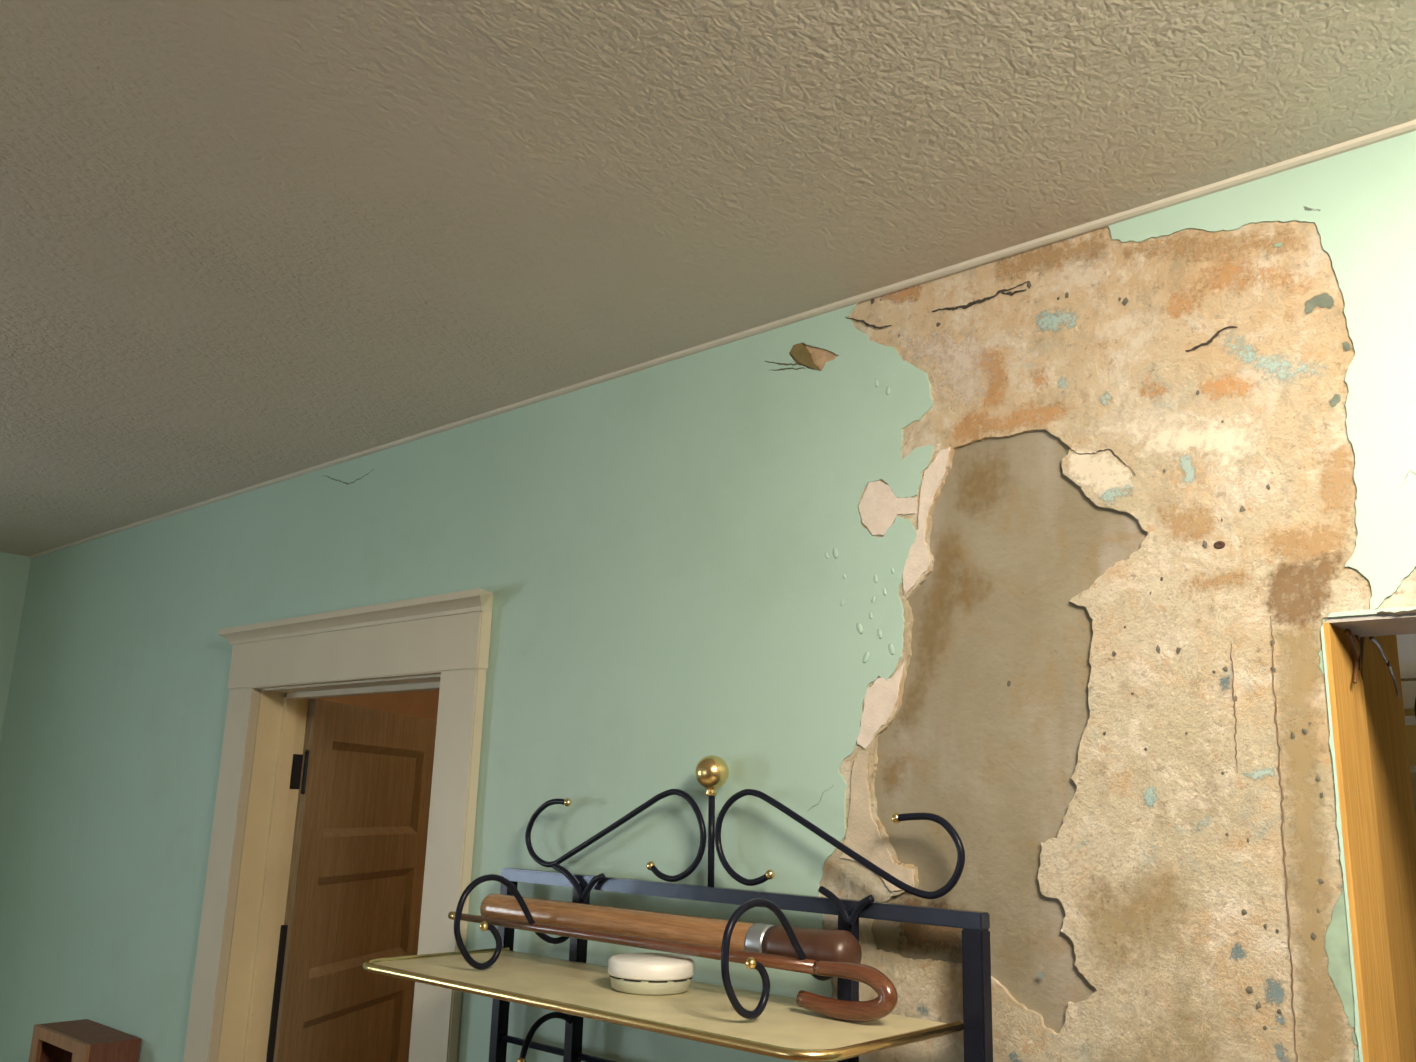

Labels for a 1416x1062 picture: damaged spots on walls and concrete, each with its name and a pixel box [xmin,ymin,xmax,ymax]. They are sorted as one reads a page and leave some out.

crack [1377,608,1416,616]
peeling [819,207,1416,1062]
leakage [898,922,962,955]